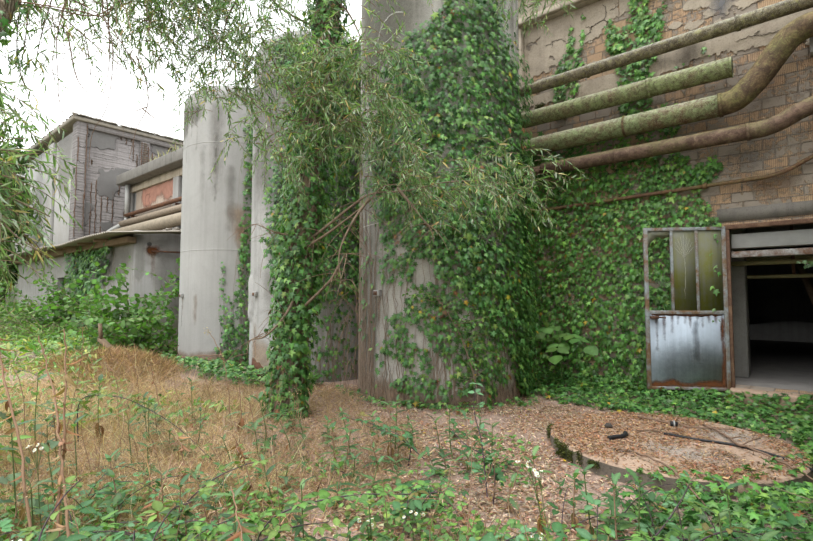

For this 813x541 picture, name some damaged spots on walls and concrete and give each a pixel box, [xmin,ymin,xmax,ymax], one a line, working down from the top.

crack [548,5,616,46]
peeling [524,0,813,112]
spalling [73,124,124,238]
spalling [120,137,154,167]
peeling [142,179,173,207]
corrosion [651,314,726,388]